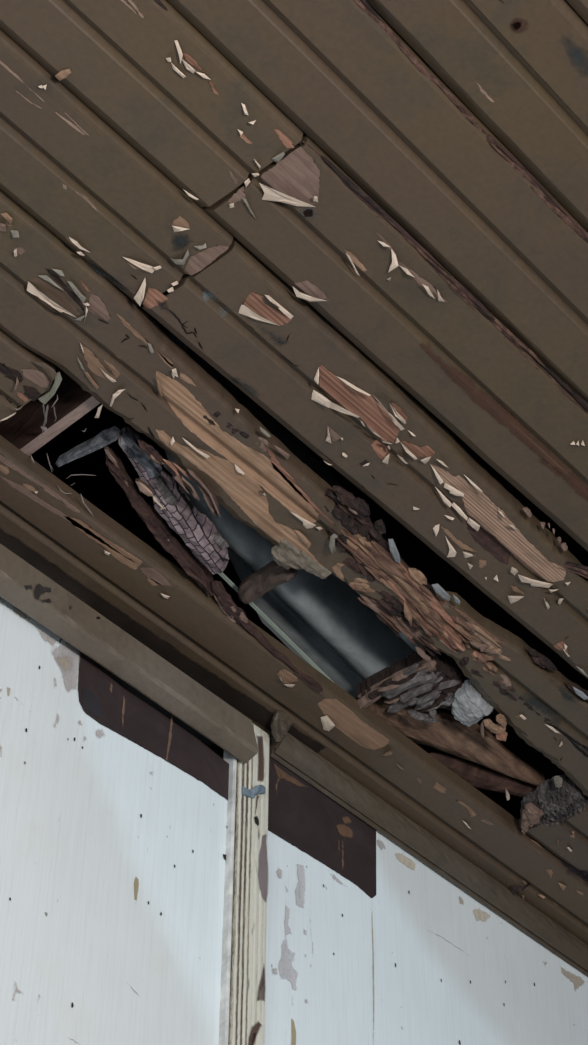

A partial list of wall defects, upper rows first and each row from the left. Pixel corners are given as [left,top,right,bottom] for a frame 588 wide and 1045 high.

peeling [166,40,219,95]
peeling [238,103,256,144]
peeling [228,129,320,220]
peeling [172,216,189,232]
peeling [122,243,229,309]
peeling [377,233,447,302]
peeling [0,361,62,421]
peeling [311,365,570,609]
peeling [0,453,172,599]
peeling [40,631,229,800]
peeling [317,699,404,770]
peeling [254,736,385,1000]